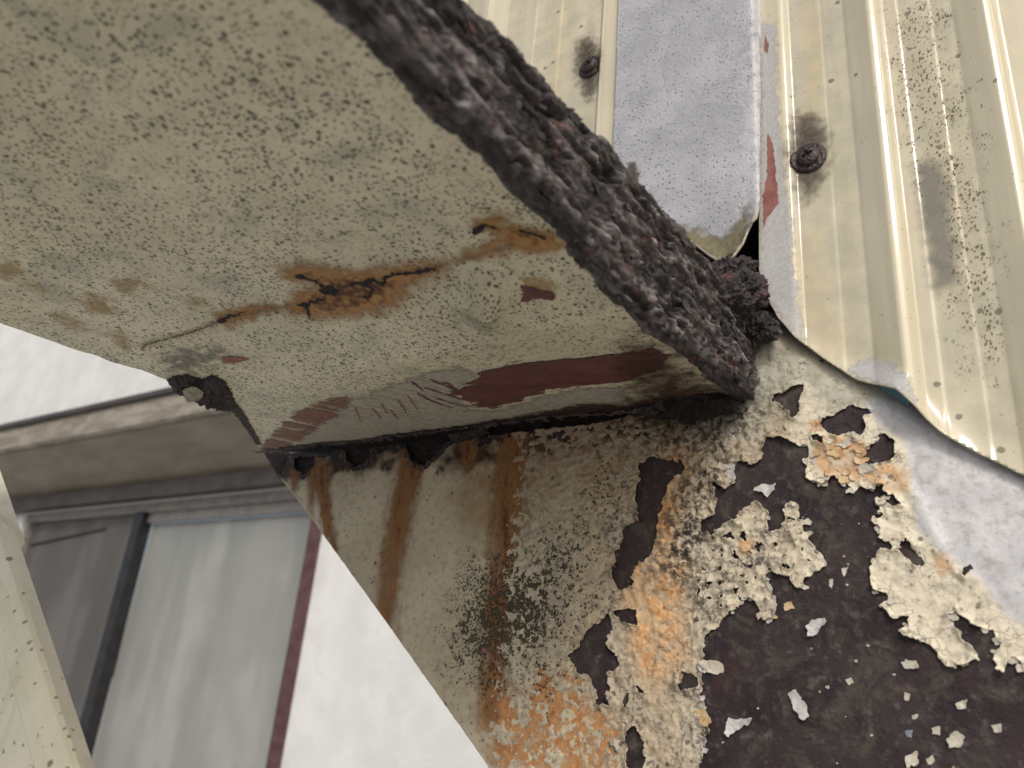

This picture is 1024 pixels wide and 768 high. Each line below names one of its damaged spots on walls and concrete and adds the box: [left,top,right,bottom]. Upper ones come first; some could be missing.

corrosion [463,217,564,260]
corrosion [214,261,441,325]
crack [142,234,548,349]
corrosion [705,253,782,348]
peeling [772,385,804,417]
peeling [848,358,918,402]
corrosion [166,345,739,768]
water stain [432,458,629,722]
peeling [611,455,685,590]
peeling [678,405,1024,768]
peeling [609,726,646,768]